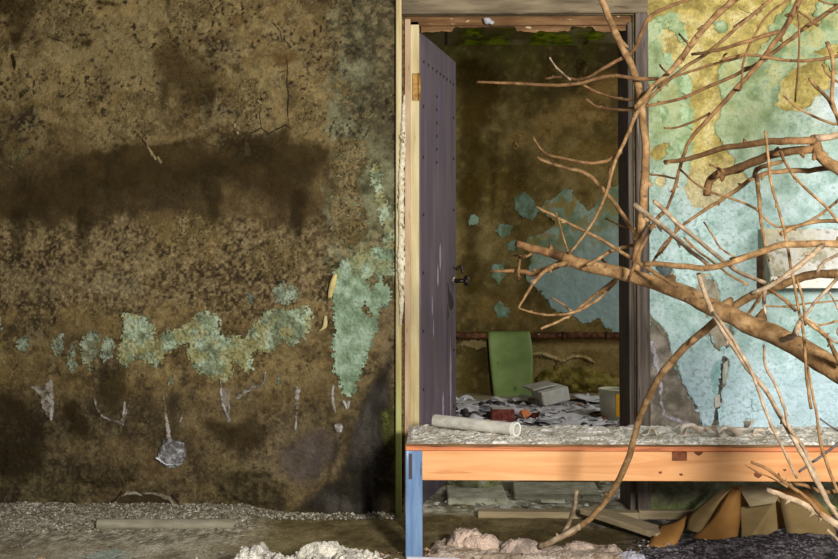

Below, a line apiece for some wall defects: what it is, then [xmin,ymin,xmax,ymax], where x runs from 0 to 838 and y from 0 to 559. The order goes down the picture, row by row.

crack [249,22,293,135]
damp [0,135,329,214]
peeling [648,0,838,354]
peeling [15,335,30,354]
damp [31,379,54,421]
damp [94,377,130,425]
peeling [50,236,315,383]
damp [208,372,266,448]
damp [301,362,389,514]
peeling [494,301,511,318]
peeling [514,185,619,332]
peeling [641,289,838,437]